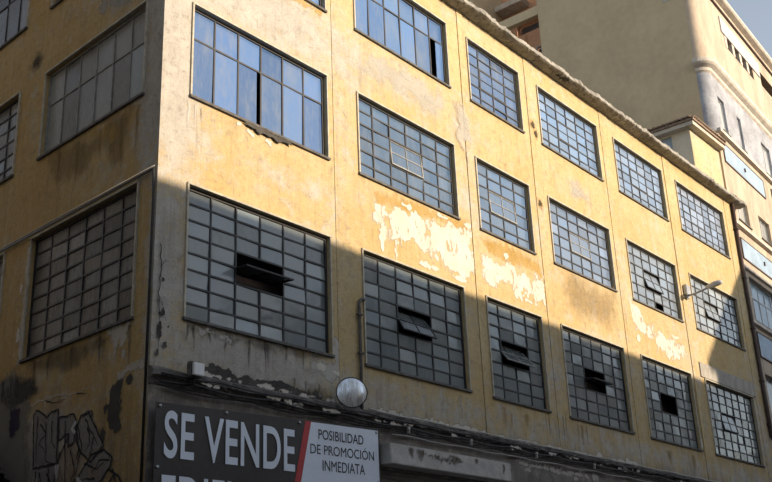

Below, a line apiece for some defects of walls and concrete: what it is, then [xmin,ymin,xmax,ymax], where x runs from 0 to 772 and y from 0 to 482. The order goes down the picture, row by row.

crack [158,244,166,347]
peeling [373,202,546,306]
peeling [629,297,685,361]
spalling [204,363,324,401]